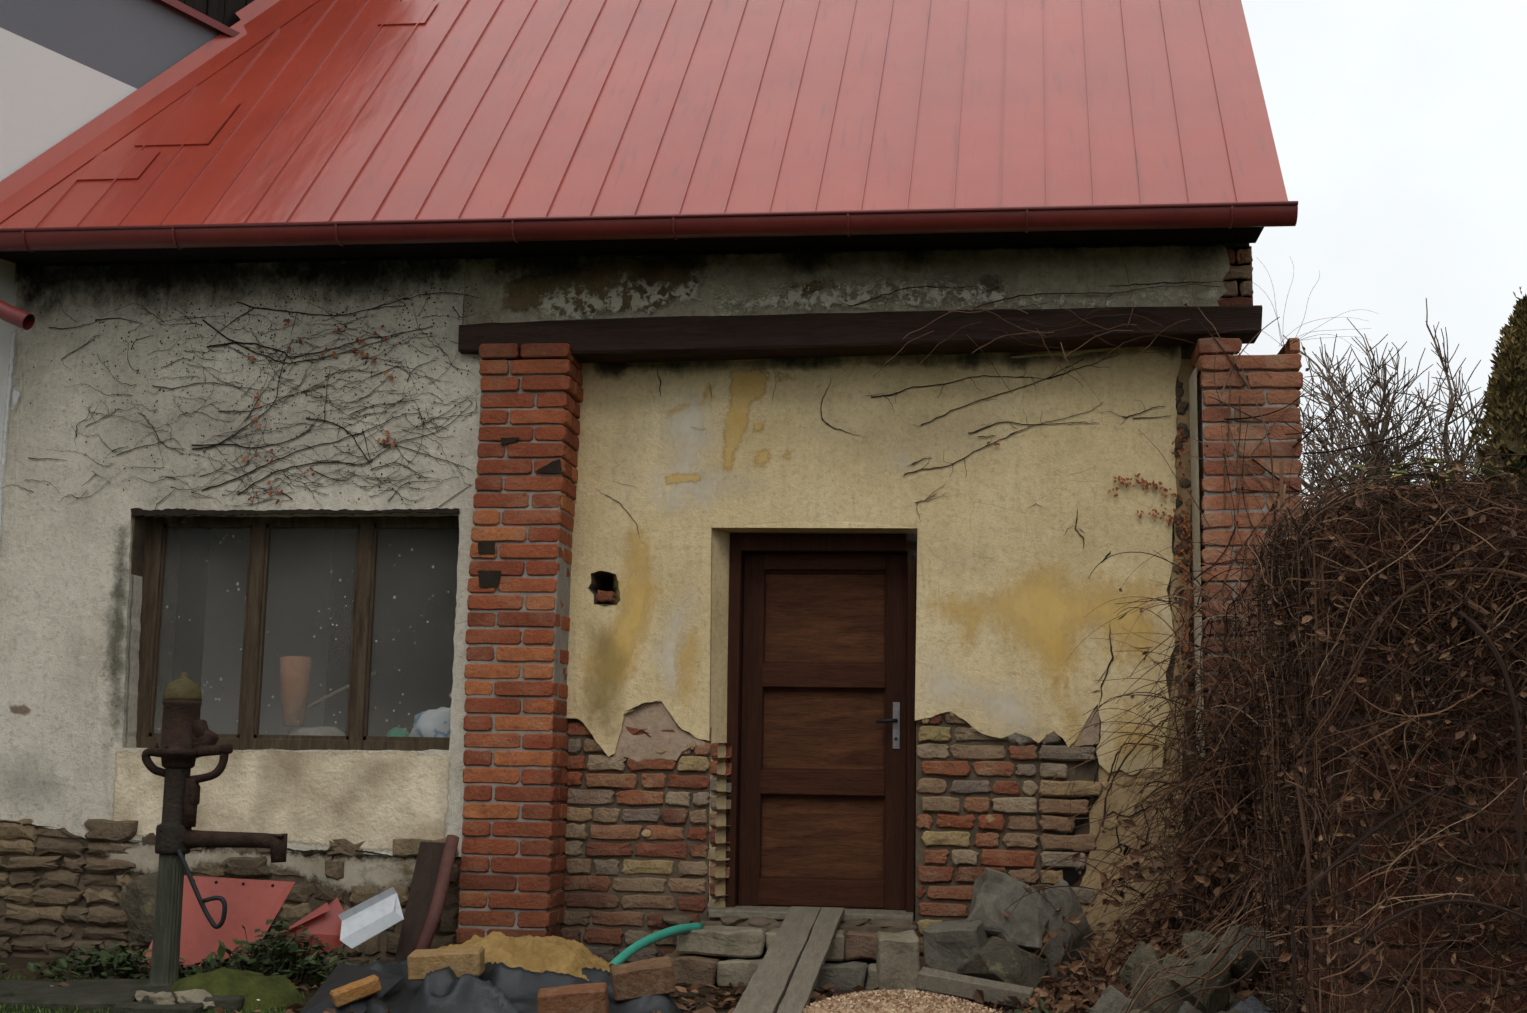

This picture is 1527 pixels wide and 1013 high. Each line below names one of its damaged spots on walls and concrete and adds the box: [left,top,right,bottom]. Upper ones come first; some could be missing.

peeling [503,256,1218,320]
damp [110,532,128,707]
spalling [915,359,1195,967]
spalling [560,700,732,964]